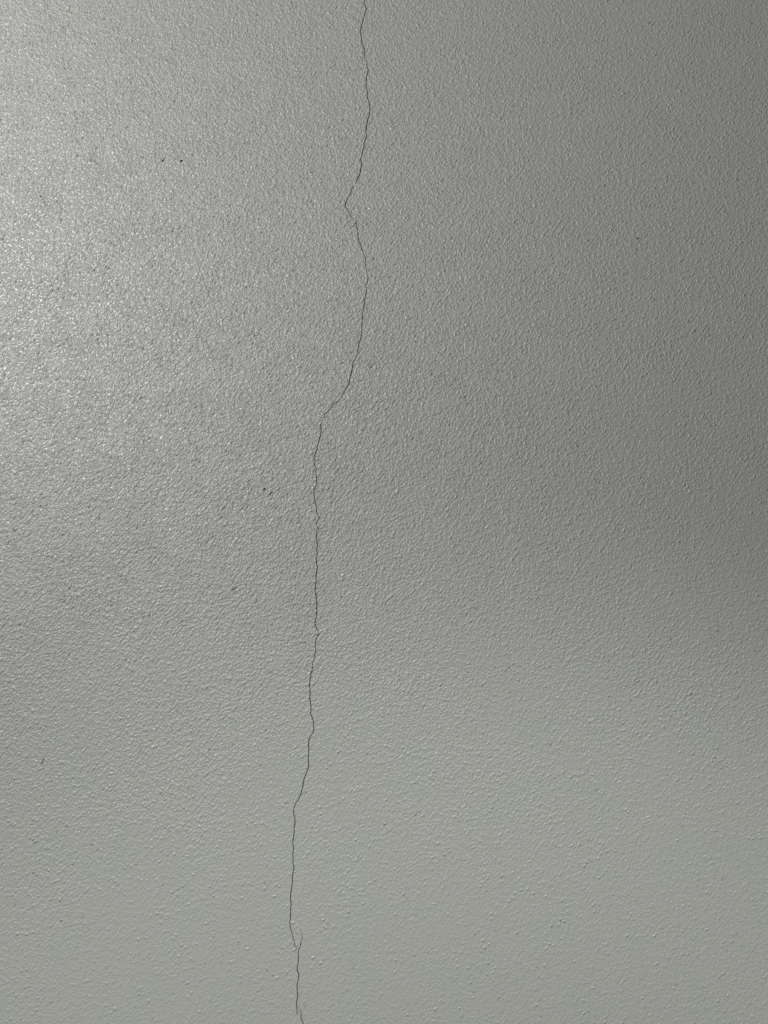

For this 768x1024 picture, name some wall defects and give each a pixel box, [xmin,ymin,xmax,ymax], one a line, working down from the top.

crack [289,0,370,1024]